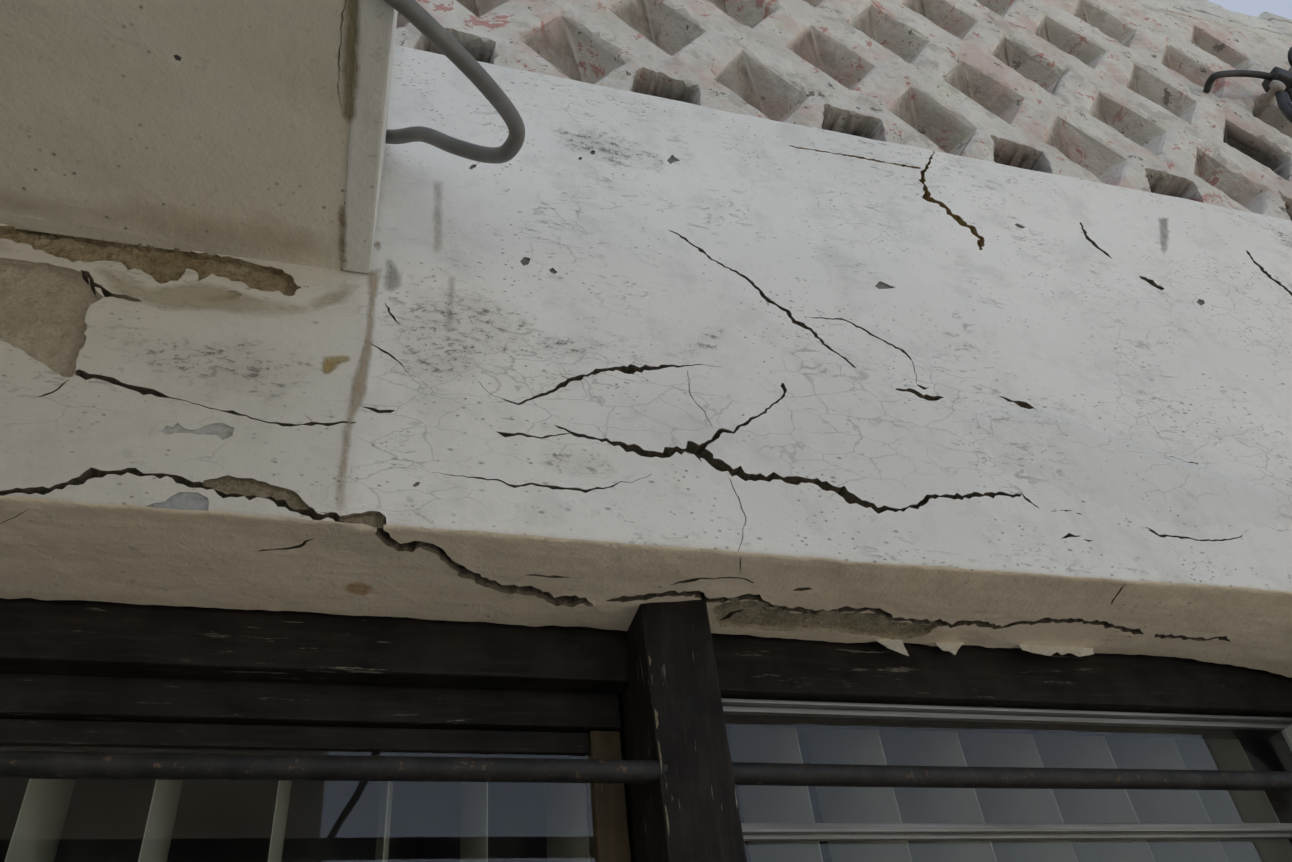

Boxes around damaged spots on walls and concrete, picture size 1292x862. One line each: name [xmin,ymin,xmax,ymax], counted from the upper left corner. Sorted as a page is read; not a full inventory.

crack [788,145,985,250]
spalling [0,225,302,378]
crack [370,303,418,378]
crack [669,230,944,401]
crack [1080,222,1112,259]
crack [1139,276,1165,290]
crack [1246,250,1292,296]
crack [0,364,1231,642]
peeling [1019,644,1094,657]